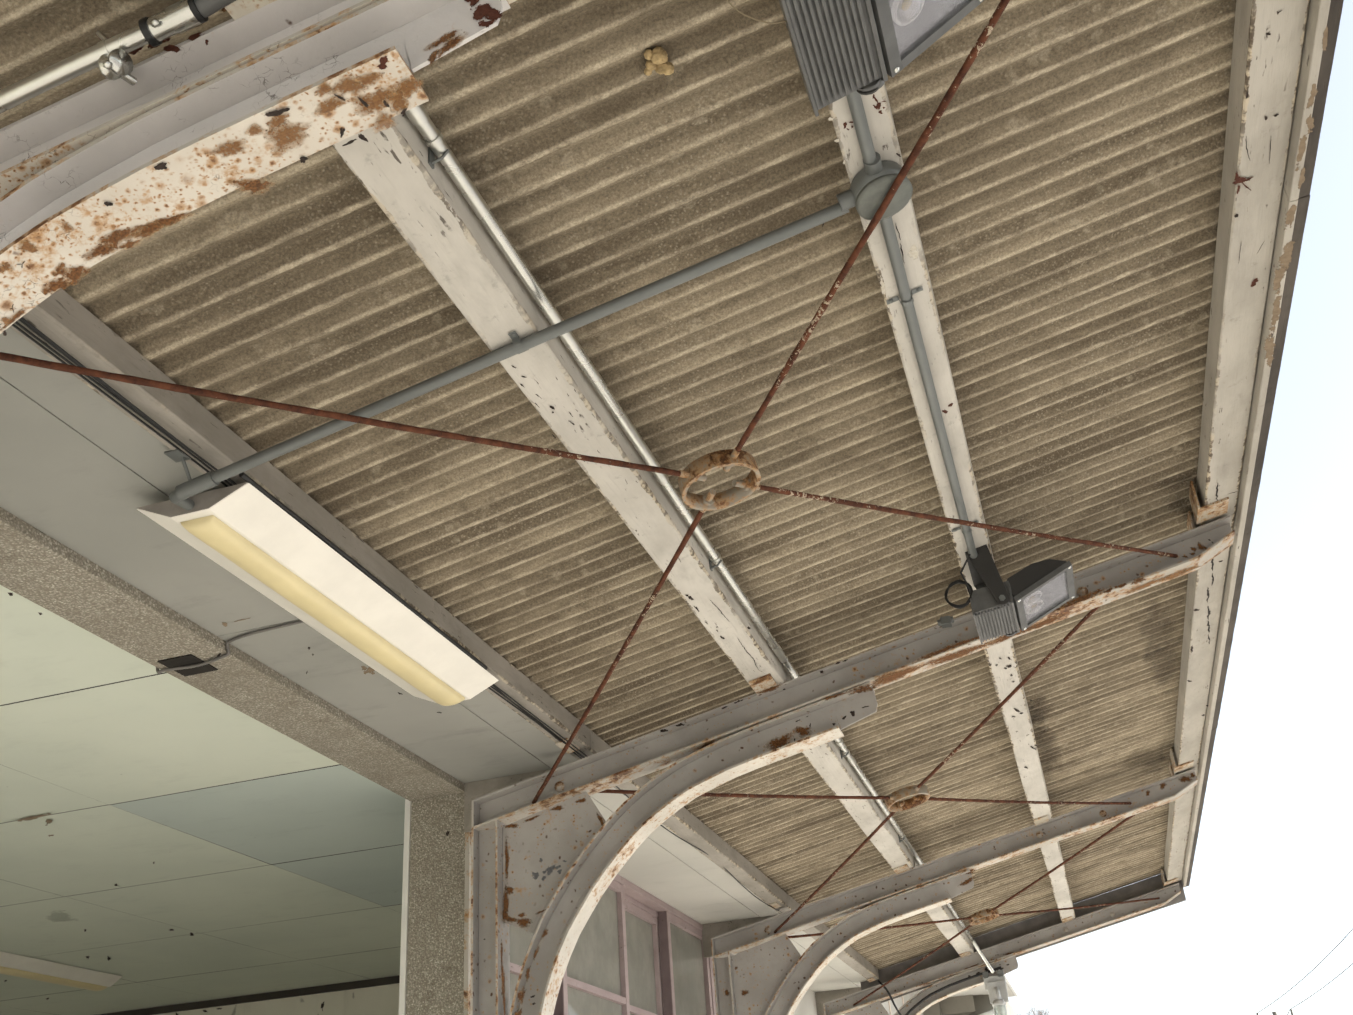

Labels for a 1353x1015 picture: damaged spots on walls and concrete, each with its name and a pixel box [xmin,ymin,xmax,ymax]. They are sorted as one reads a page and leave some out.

rust [426,30,465,64]
rust [205,73,423,157]
peeling [1295,84,1318,189]
rust [232,179,273,195]
rust [0,309,25,331]
rust [19,240,38,253]
rust [42,213,197,295]
peeling [1264,205,1297,367]